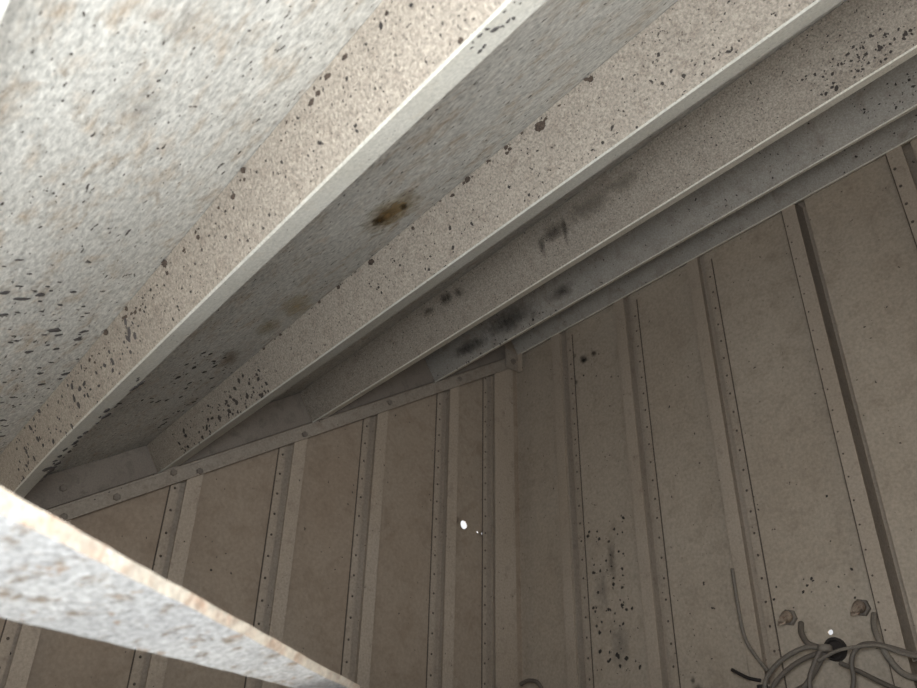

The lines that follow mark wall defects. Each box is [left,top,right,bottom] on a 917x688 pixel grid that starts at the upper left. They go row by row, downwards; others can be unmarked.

rust [375,196,410,225]
water stain [592,550,633,637]